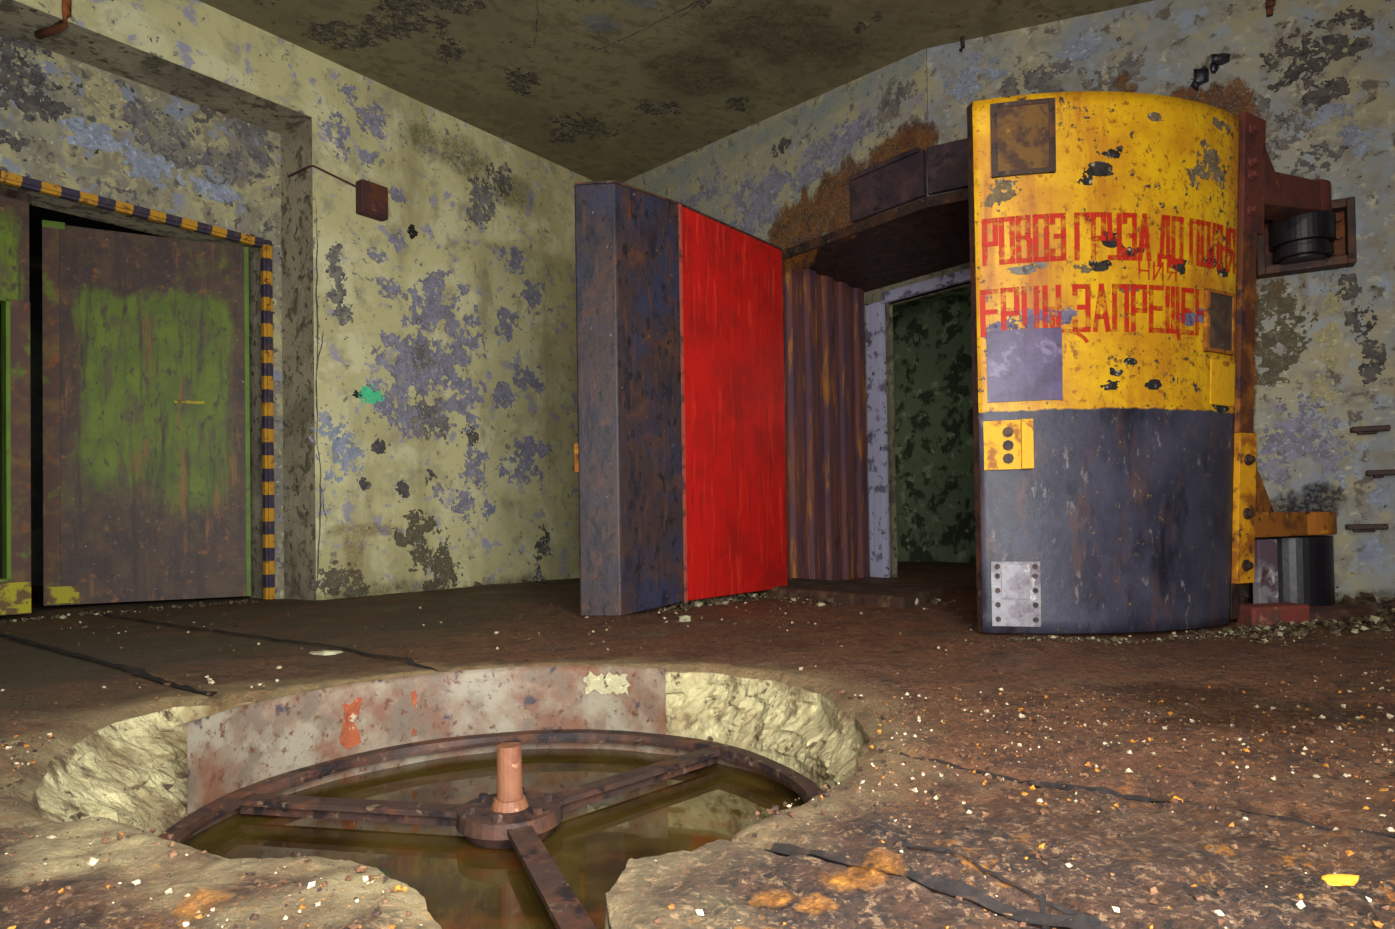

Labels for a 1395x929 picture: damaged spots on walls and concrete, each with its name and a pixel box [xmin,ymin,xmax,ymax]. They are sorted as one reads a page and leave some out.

peeling [0,32,280,205]
peeling [321,83,392,165]
corrosion [1171,78,1260,117]
peeling [1246,8,1375,179]
peeling [464,162,515,230]
corrosion [769,121,938,274]
peeling [308,224,556,591]
flaking render [1254,273,1387,496]
spalling [30,699,269,837]
peeling [583,671,630,696]
spalling [666,672,870,791]
crack [897,840,1106,929]